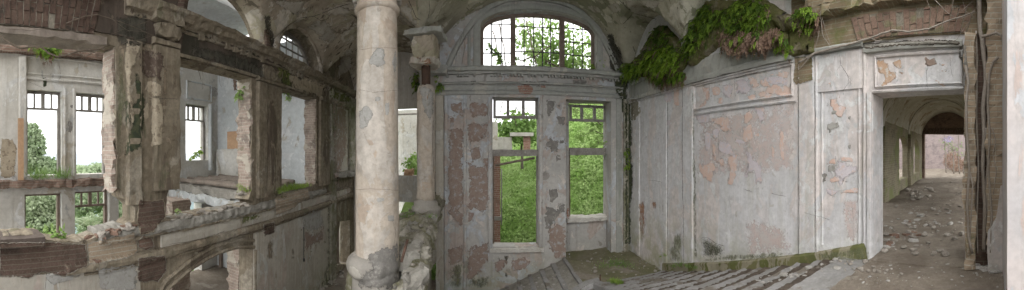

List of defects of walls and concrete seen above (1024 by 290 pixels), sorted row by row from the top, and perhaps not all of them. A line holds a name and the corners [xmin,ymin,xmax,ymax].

spalling [863,39,969,89]
peeling [827,81,851,135]
peeling [446,100,492,225]
peeling [822,145,858,198]
peeling [543,188,570,260]
spalling [358,244,400,290]
peeling [447,241,536,280]